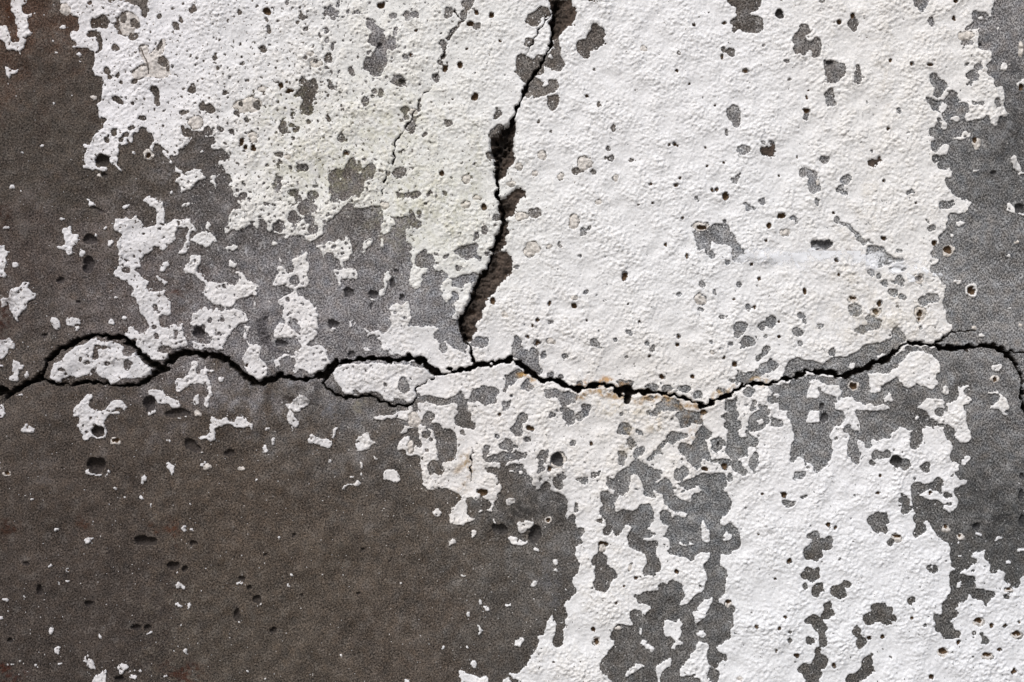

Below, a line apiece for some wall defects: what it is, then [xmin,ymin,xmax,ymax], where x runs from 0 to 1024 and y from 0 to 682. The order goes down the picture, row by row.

peeling [0,0,592,682]
crack [0,0,1024,412]
peeling [576,0,1024,682]